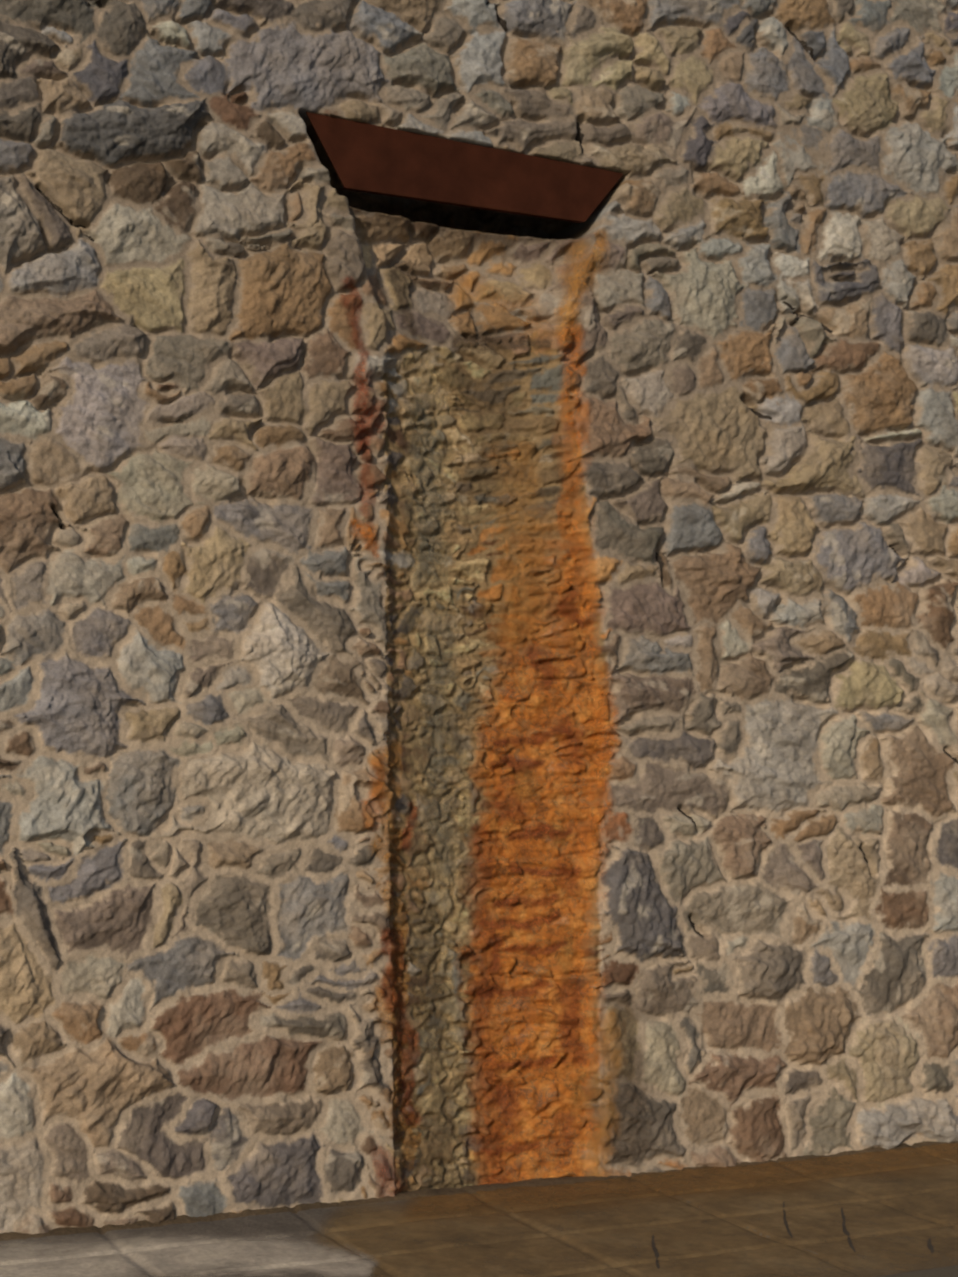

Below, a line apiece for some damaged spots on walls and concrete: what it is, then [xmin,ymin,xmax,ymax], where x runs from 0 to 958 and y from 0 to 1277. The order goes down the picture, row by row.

corrosion [343,278,381,451]
corrosion [556,234,606,377]
corrosion [462,391,617,1185]
corrosion [377,889,421,1158]